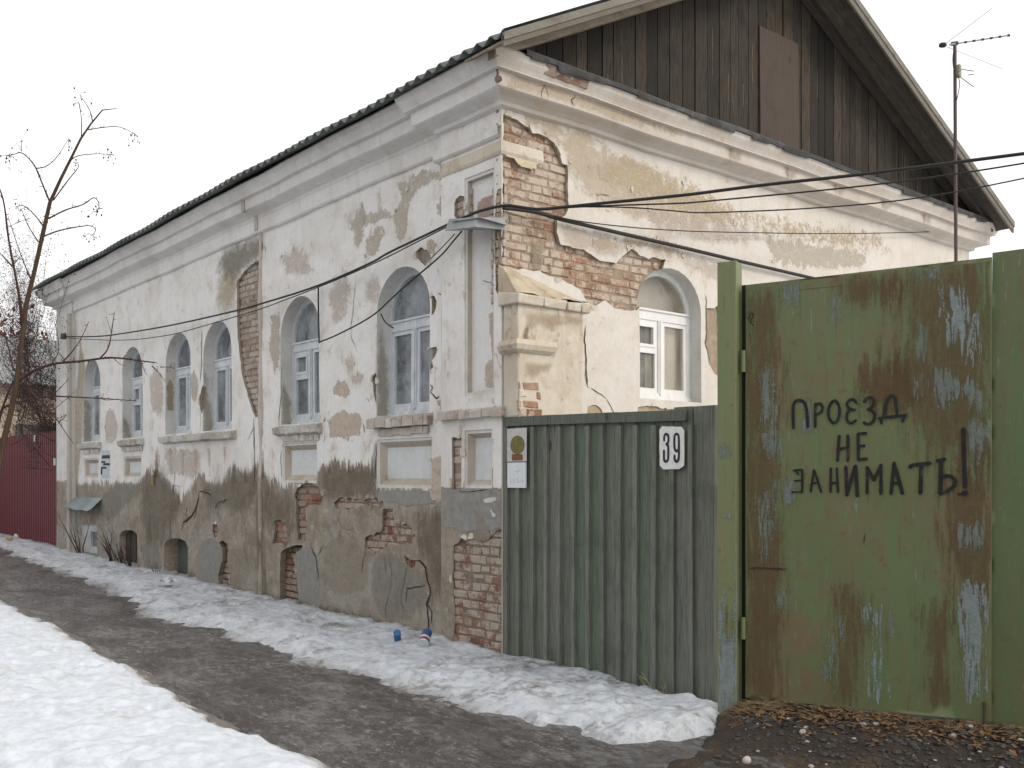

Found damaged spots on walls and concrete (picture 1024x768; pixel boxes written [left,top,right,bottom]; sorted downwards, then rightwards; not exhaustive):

peeling [511,64,677,134]
spalling [456,109,887,387]
spalling [235,263,280,416]
spalling [517,382,542,427]
crack [584,328,614,412]
crack [173,474,226,530]
spalling [271,480,324,600]
spalling [336,494,416,555]
crack [361,555,432,629]
spalling [449,529,502,654]